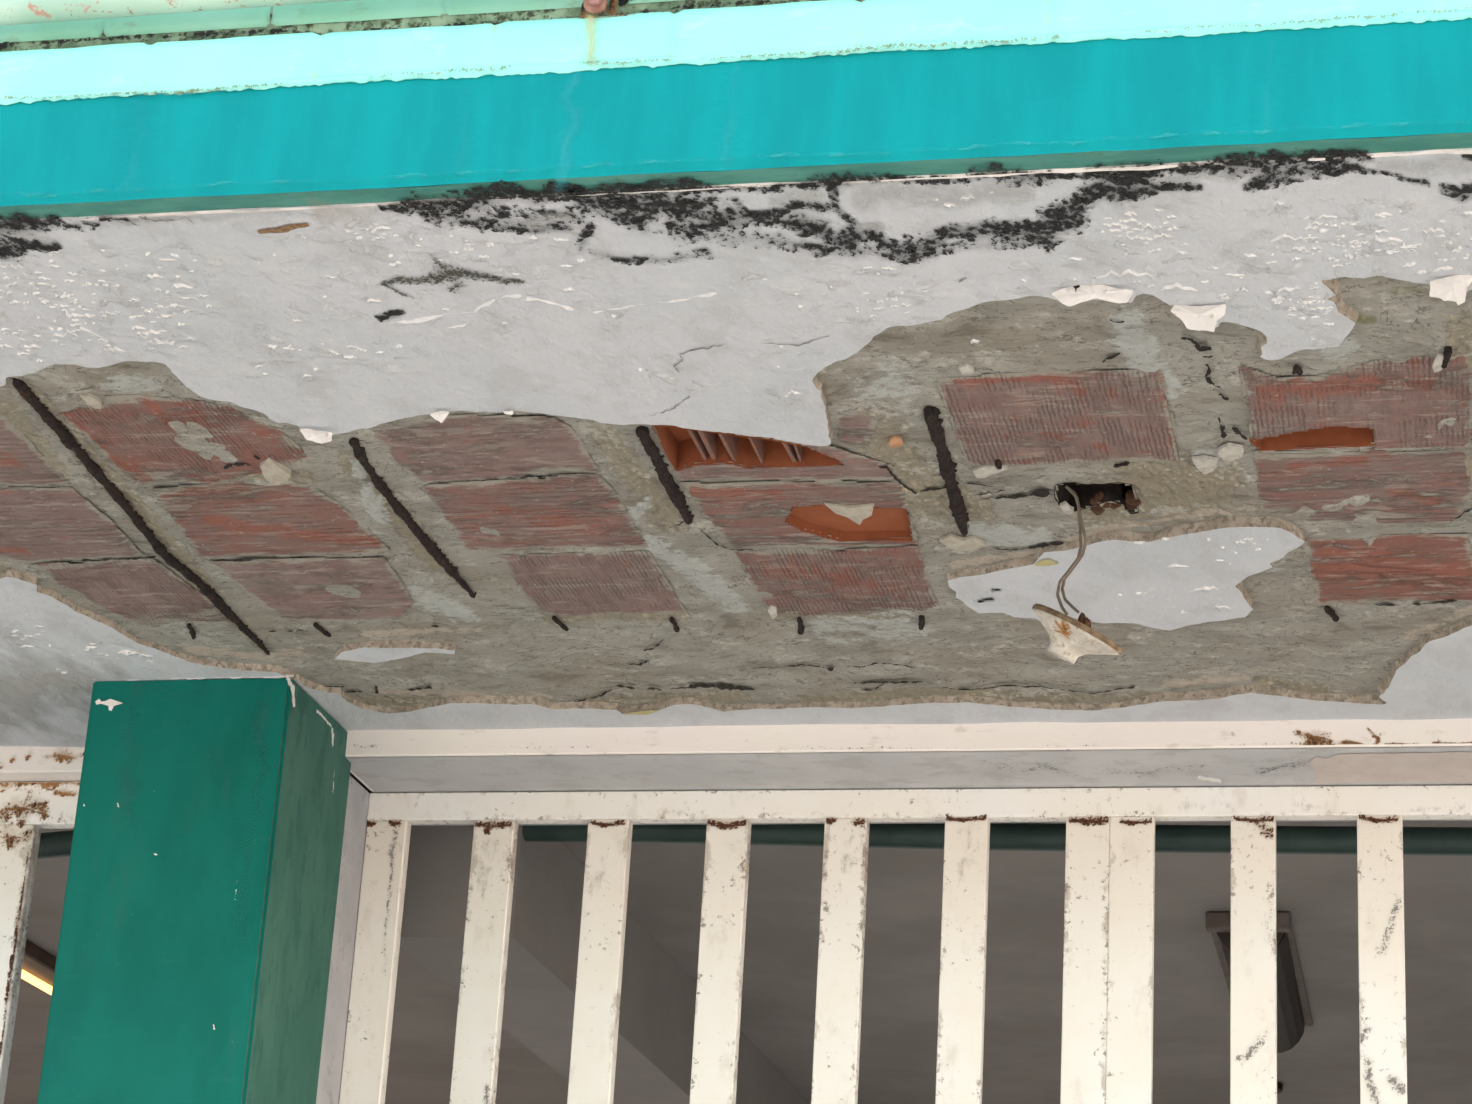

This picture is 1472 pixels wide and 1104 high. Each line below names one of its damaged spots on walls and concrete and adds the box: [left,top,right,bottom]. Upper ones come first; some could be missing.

water stain [0,212,150,265]
water stain [374,254,524,322]
water stain [378,149,1472,266]
spalling [0,275,1472,715]
rust [0,748,84,1055]